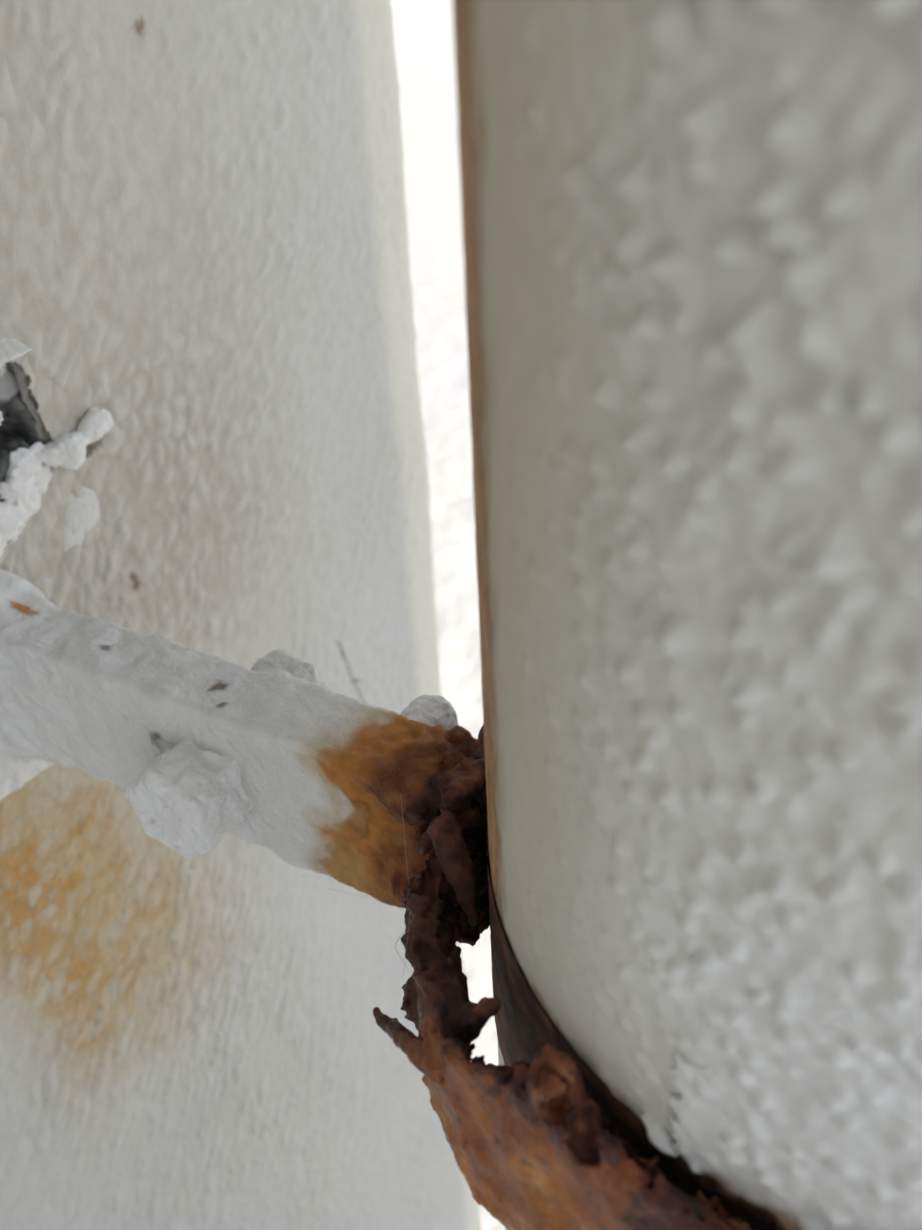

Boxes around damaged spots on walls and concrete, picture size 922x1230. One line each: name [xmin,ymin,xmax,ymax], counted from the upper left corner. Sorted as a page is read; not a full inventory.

peeling [86,439,101,458]
rust [315,712,460,906]
rust [0,829,96,978]